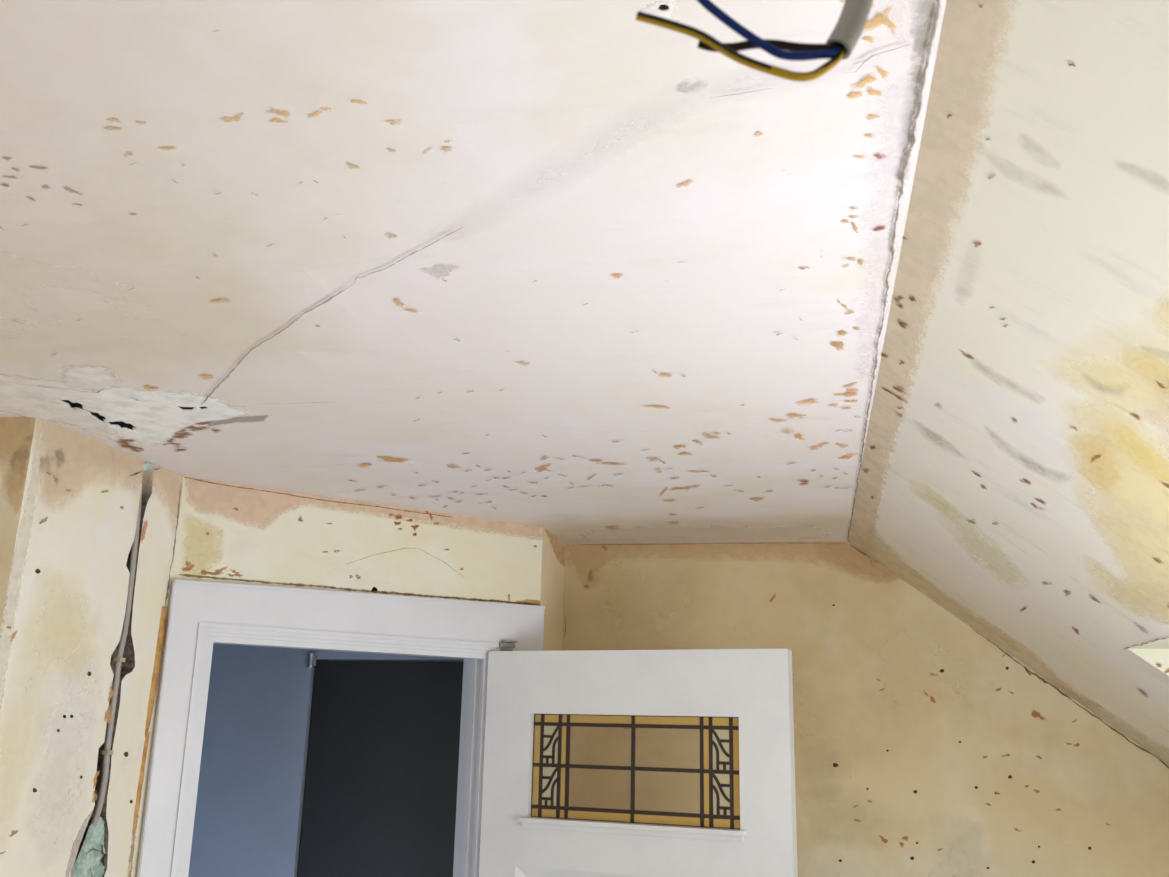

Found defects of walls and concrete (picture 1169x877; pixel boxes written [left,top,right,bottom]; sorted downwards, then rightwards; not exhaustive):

crack [201,228,461,406]
crack [580,0,940,561]
spalling [0,365,247,452]
water stain [1087,416,1169,616]
crack [973,629,1169,768]